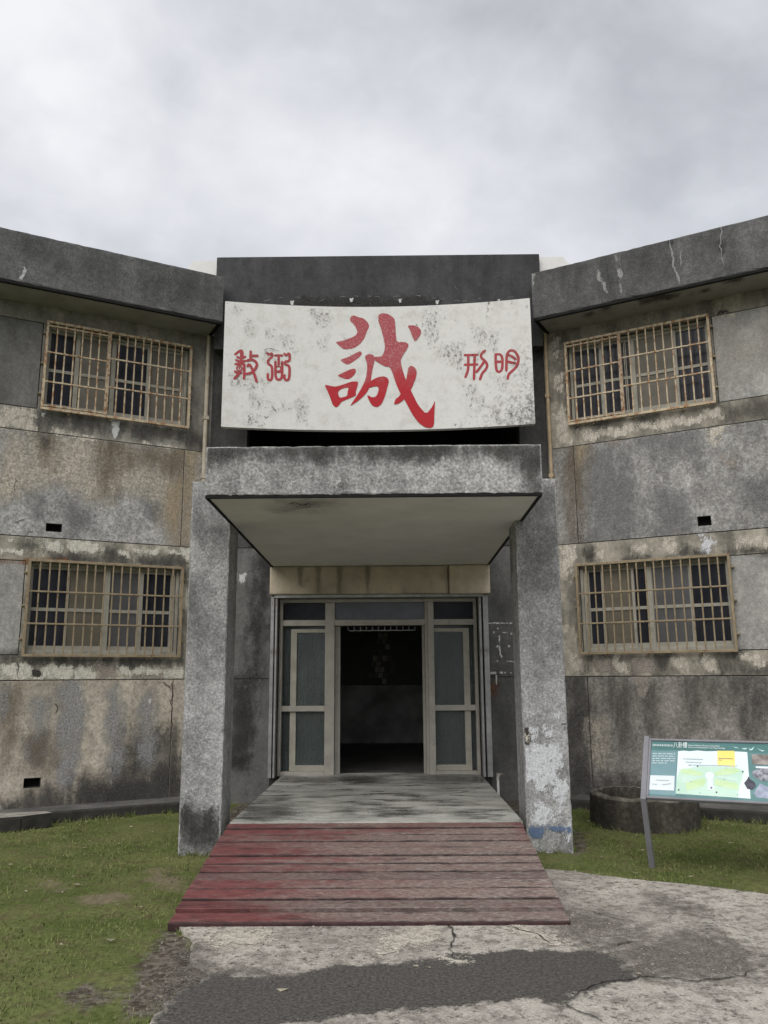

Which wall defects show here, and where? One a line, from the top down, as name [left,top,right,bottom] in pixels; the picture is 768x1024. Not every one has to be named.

crack [669,242,682,284]
damp [661,494,717,556]
damp [52,550,186,577]
damp [3,653,90,667]
damp [103,657,174,668]
damp [0,680,219,855]
crack [447,925,458,956]
crack [563,964,766,1023]